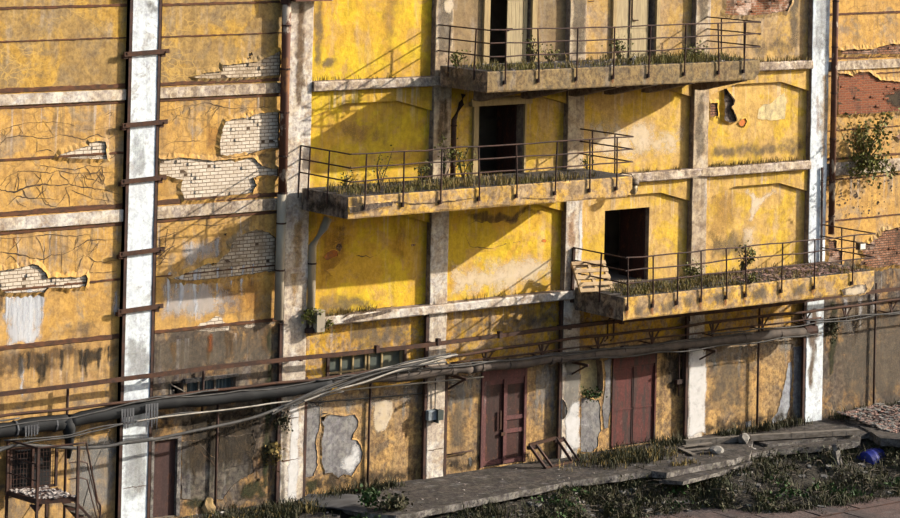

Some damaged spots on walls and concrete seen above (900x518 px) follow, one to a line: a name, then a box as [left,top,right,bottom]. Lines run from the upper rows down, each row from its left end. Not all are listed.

flaking render [720,0,794,20]
flaking render [709,88,788,127]
flaking render [837,39,900,119]
crack [0,112,118,208]
flaking render [158,107,280,205]
flaking render [0,258,90,298]
crack [0,233,117,273]
flaking render [167,224,276,286]
flaking render [855,223,900,271]
leakage [0,289,117,389]
flaking render [306,400,364,480]
flaking render [564,358,612,453]